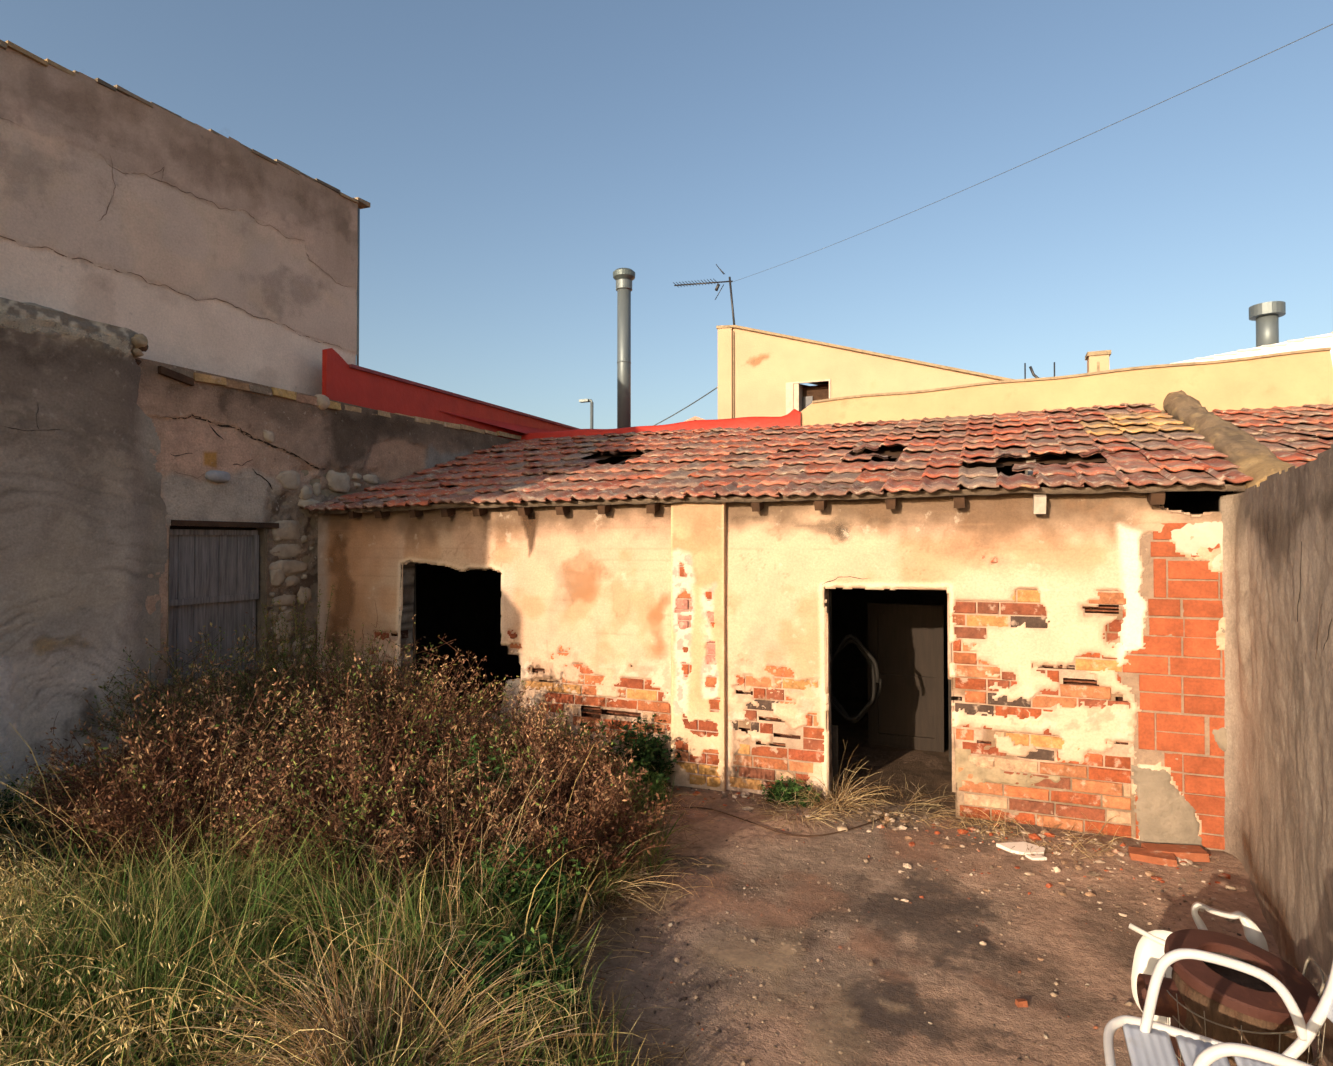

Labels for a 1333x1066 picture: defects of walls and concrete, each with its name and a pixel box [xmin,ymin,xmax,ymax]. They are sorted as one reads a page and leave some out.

crack [99,156,347,287]
crack [0,236,340,347]
crack [170,414,323,488]
flaking render [512,563,824,790]
flaking render [951,589,1131,838]